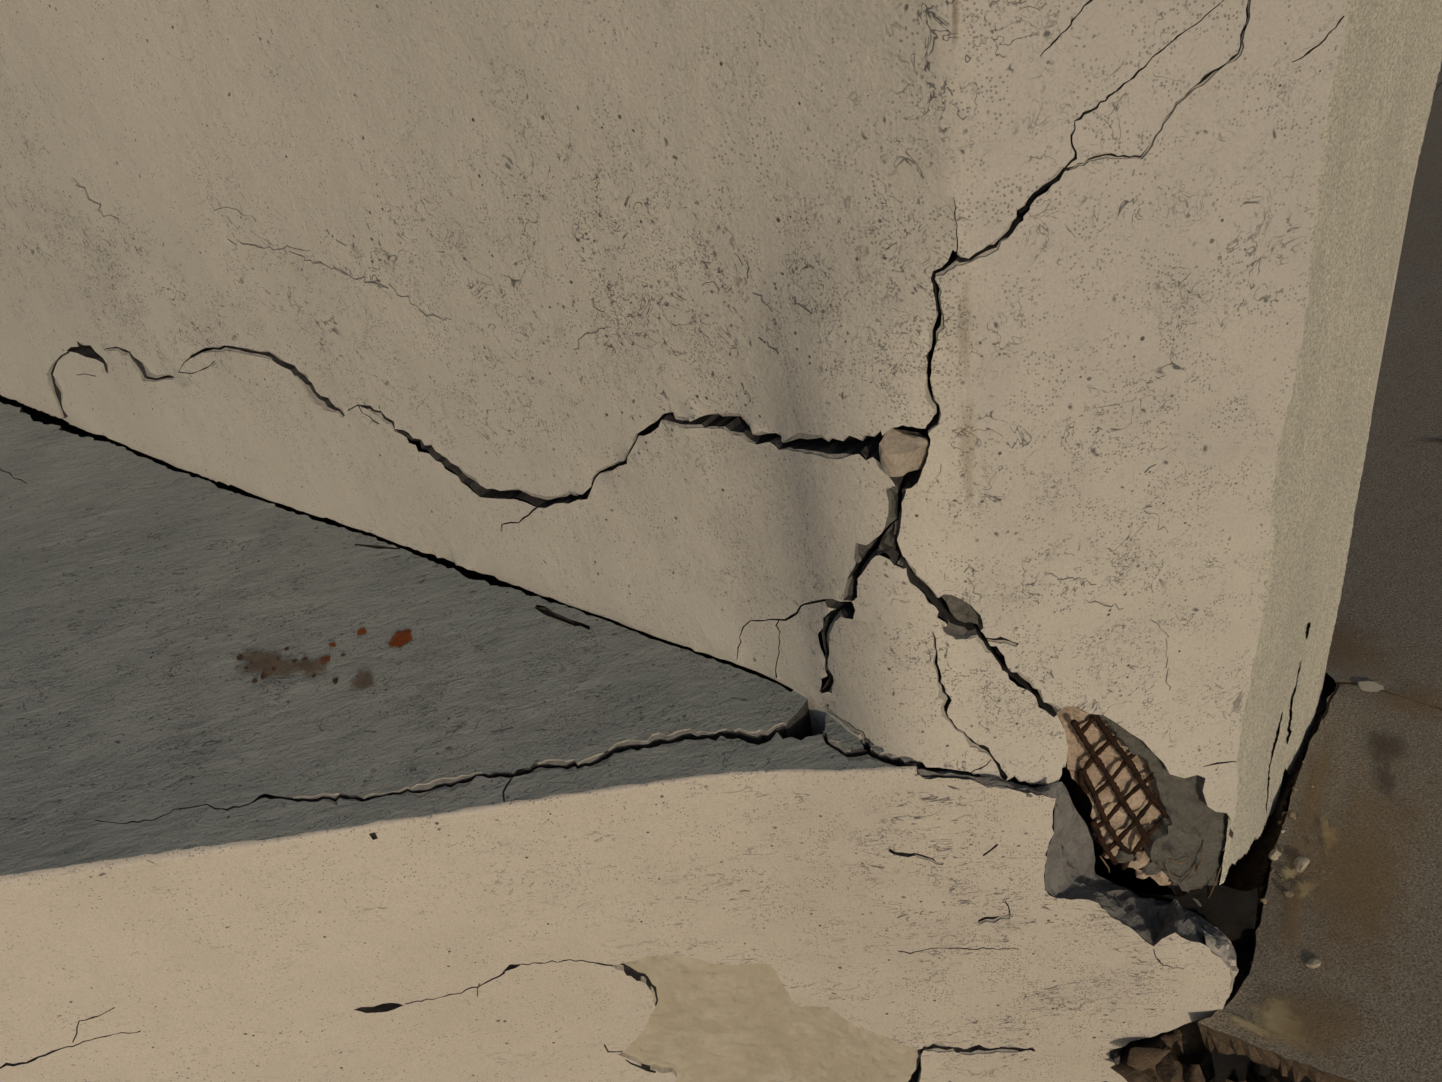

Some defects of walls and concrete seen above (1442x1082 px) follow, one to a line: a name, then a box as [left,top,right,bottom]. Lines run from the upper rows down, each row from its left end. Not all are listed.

crack [1292,16,1345,62]
crack [0,0,1251,824]
rust [236,642,373,688]
rust [388,629,412,648]
spalling [1040,706,1233,907]
crack [0,1007,141,1069]
crack [405,972,505,1005]
peeling [503,954,924,1082]